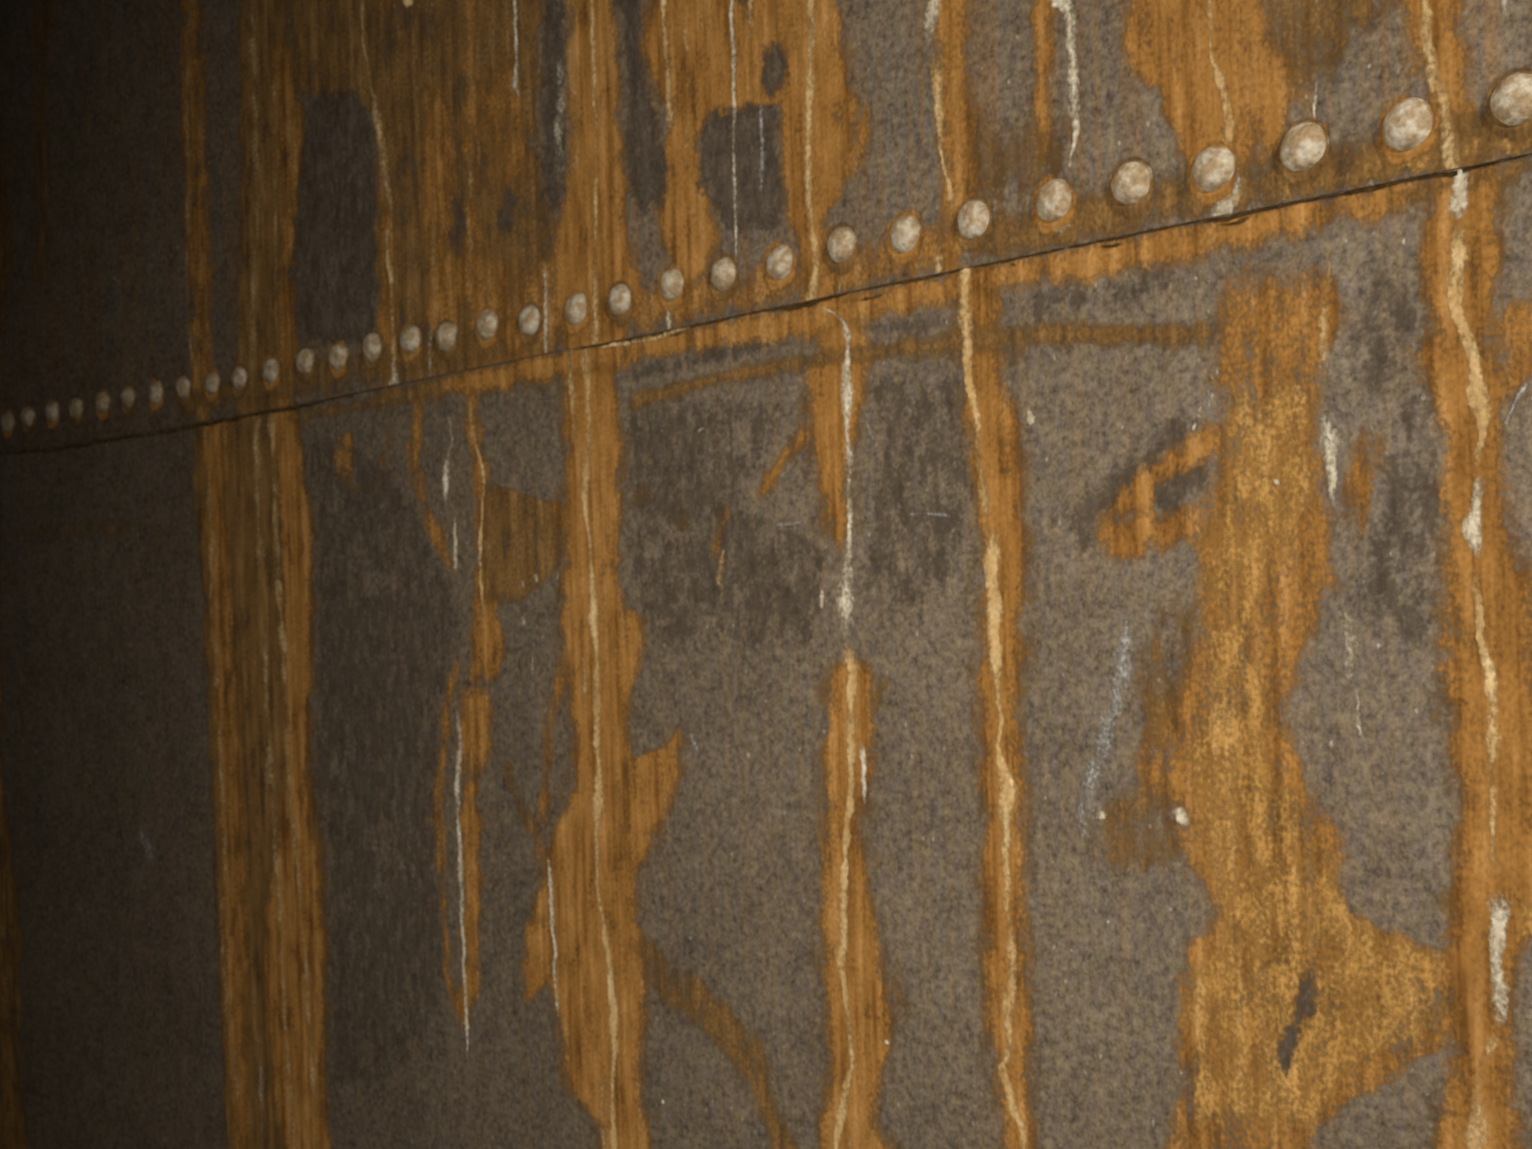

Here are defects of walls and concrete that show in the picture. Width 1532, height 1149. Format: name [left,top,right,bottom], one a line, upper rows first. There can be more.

rust [174,0,667,1149]
rust [347,272,965,1149]
leakage [1052,0,1080,166]
rust [639,0,1532,324]
rust [960,157,1532,1149]